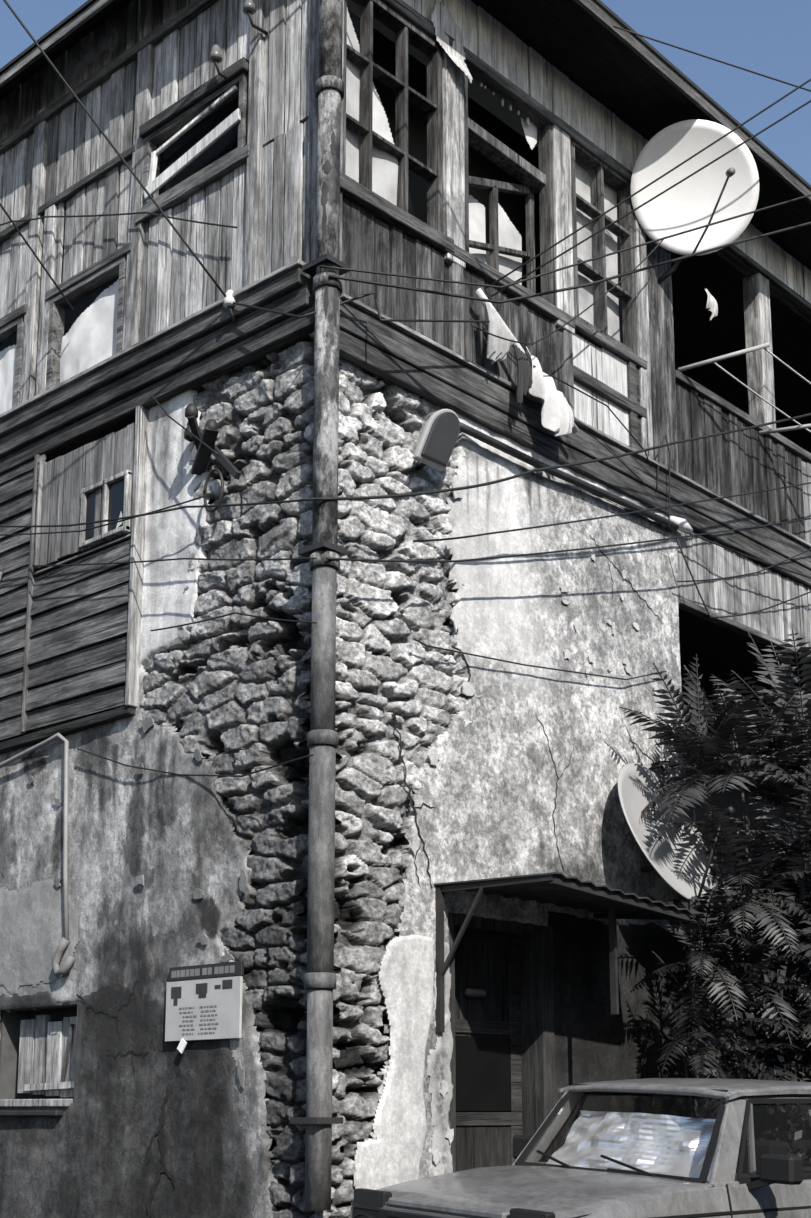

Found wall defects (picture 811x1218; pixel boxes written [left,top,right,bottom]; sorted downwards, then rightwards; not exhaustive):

peeling [196,527,205,545]
peeling [450,606,461,632]
peeling [462,682,476,696]
crack [537,718,574,872]
peeling [410,831,418,856]
spalling [193,888,220,945]
crack [76,980,154,1075]
leakage [94,932,157,1066]
peeling [427,942,454,1176]
crack [142,1087,176,1218]